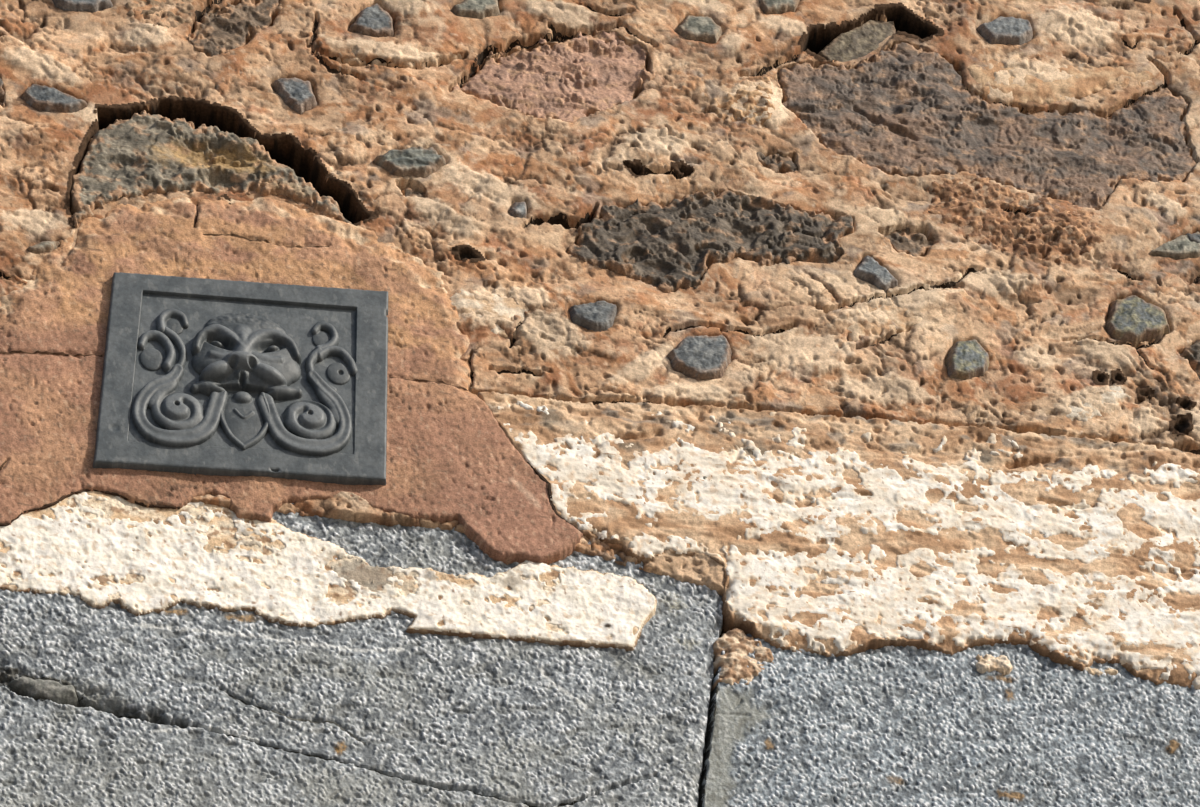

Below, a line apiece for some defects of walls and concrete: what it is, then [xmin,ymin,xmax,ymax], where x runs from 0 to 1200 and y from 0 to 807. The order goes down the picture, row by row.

crack [310,5,651,88]
crack [194,204,329,248]
peeling [0,492,656,649]
peeling [498,396,1200,690]
peeling [0,667,84,707]
crack [204,689,587,807]
crack [698,629,725,807]